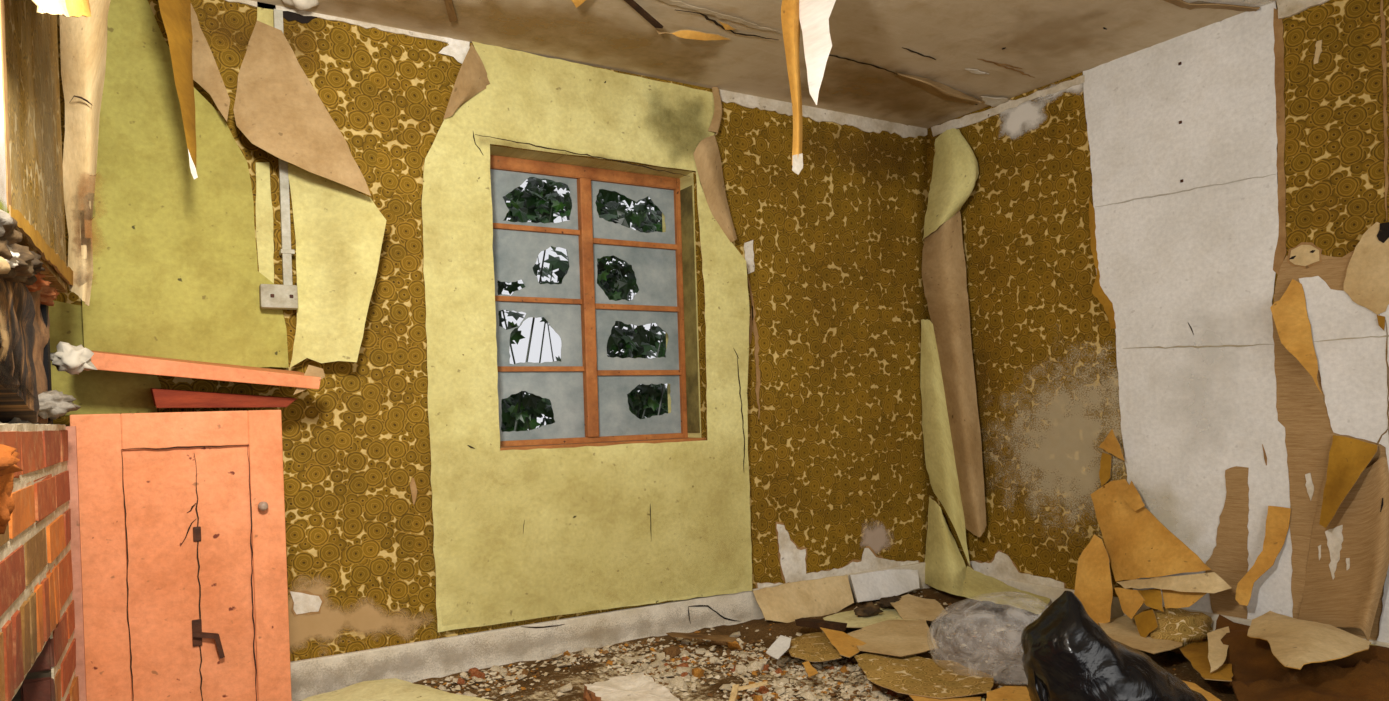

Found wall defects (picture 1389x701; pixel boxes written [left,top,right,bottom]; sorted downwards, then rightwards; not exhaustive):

spalling [439,37,470,64]
peeling [677,10,778,40]
peeling [1164,0,1273,12]
flaking render [0,0,11,212]
peeling [158,0,371,196]
peeling [32,0,111,306]
spalling [744,240,755,274]
spalling [50,341,97,375]
leakage [992,347,1124,524]
peeling [1270,276,1389,579]
flaking render [755,522,920,588]
peeling [1377,566,1389,643]